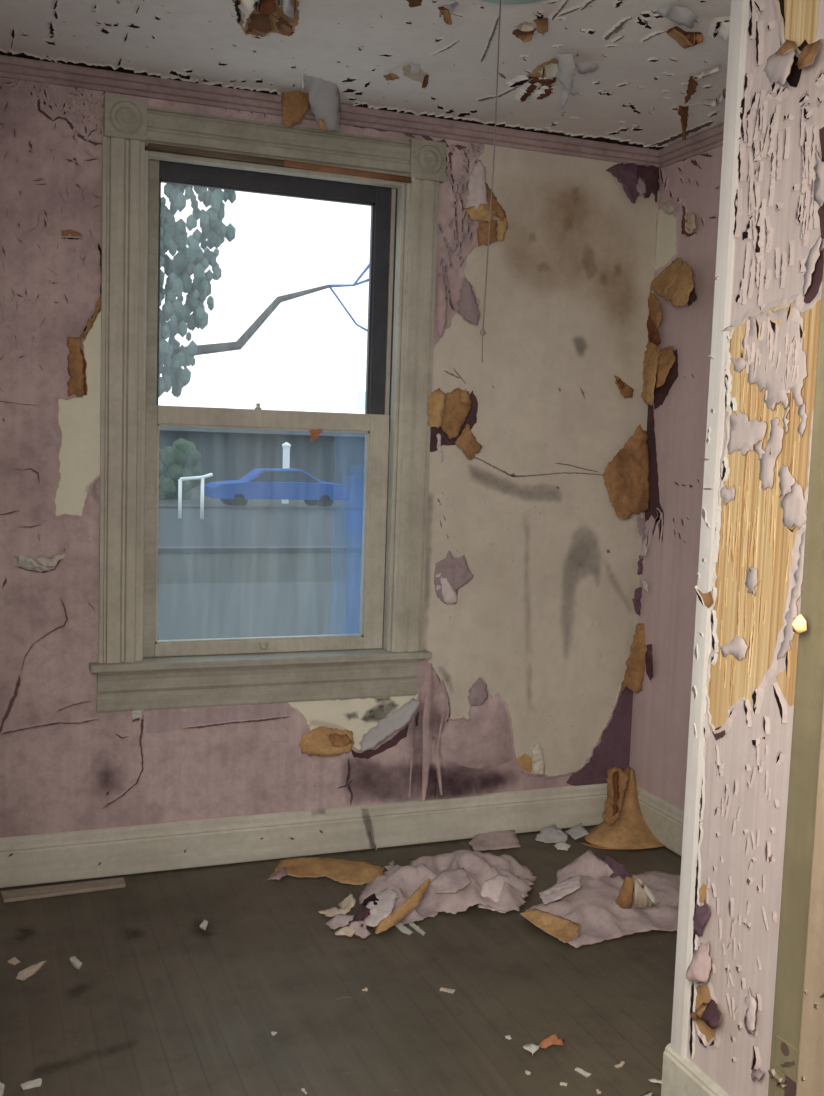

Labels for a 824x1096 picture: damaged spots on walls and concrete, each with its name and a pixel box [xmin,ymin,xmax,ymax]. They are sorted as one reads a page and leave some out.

peeling [230,0,300,52]
spalling [336,53,491,121]
peeling [506,0,730,140]
flaking render [55,311,101,516]
crack [14,467,41,484]
flaking render [401,132,723,776]
crack [0,509,42,541]
peeling [673,0,824,1082]
crack [0,577,8,588]
crack [0,597,145,810]
flaking render [288,694,418,750]
damp [409,767,458,786]